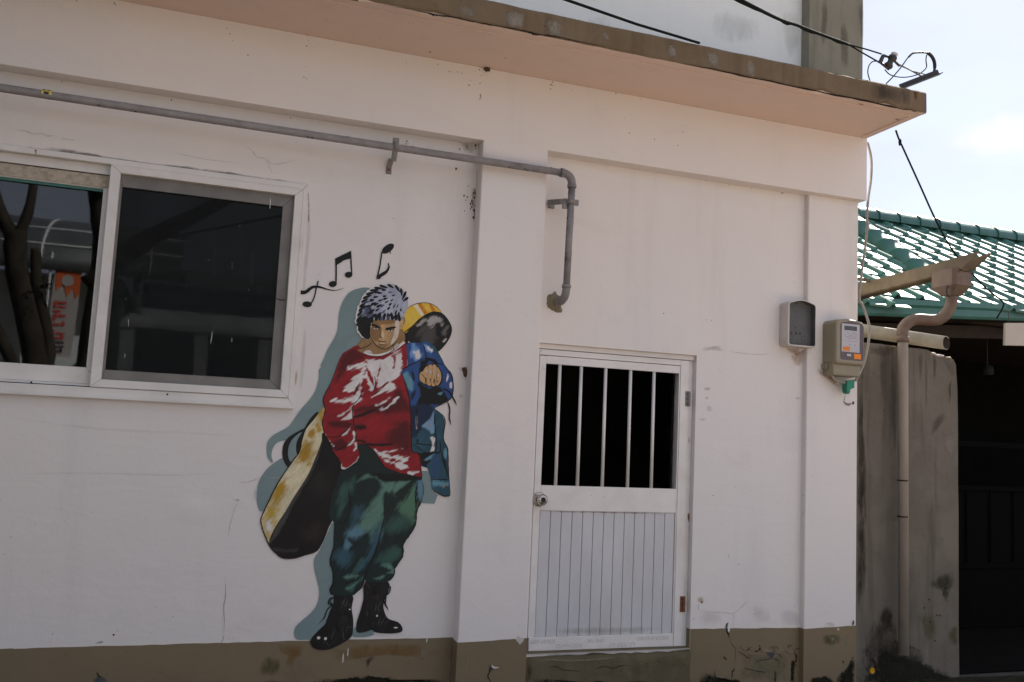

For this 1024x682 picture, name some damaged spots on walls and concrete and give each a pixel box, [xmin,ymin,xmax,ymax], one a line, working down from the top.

damp [811,609,949,682]